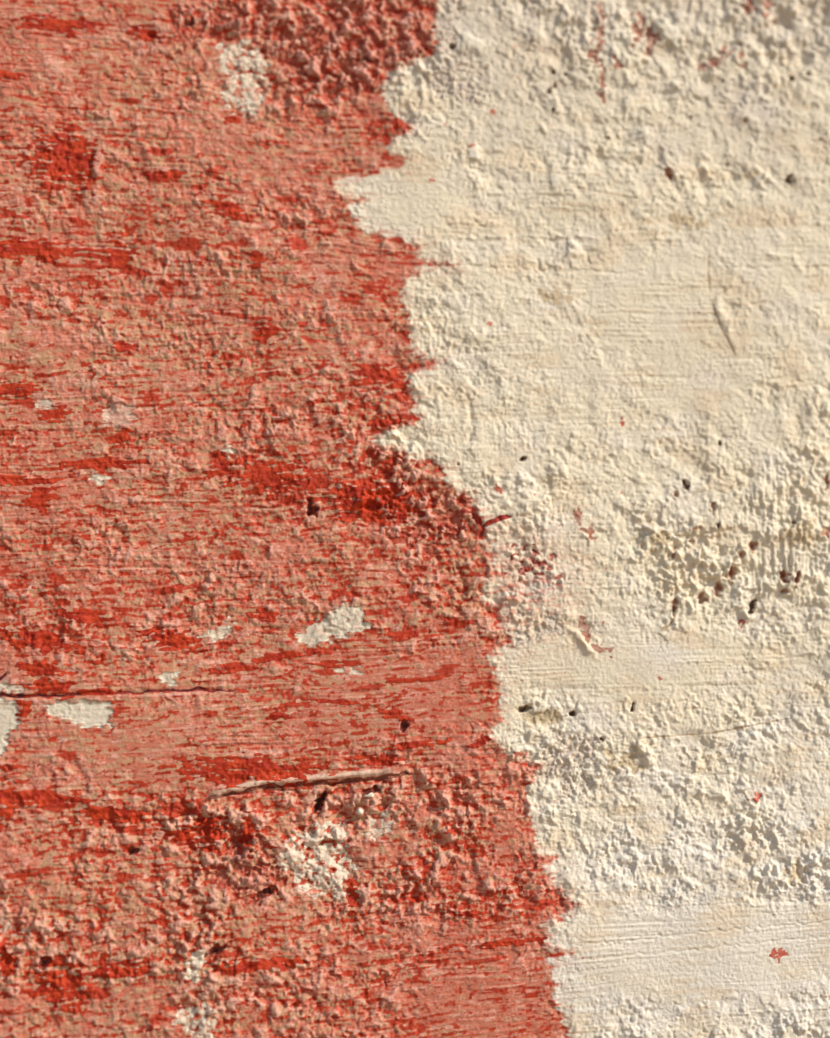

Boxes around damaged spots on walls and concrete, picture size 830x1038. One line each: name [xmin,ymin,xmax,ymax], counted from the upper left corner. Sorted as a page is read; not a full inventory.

spalling [153,0,496,117]
peeling [294,602,372,647]
crack [0,673,234,698]
peeling [0,679,30,756]
peeling [44,699,114,729]
crack [199,769,411,804]